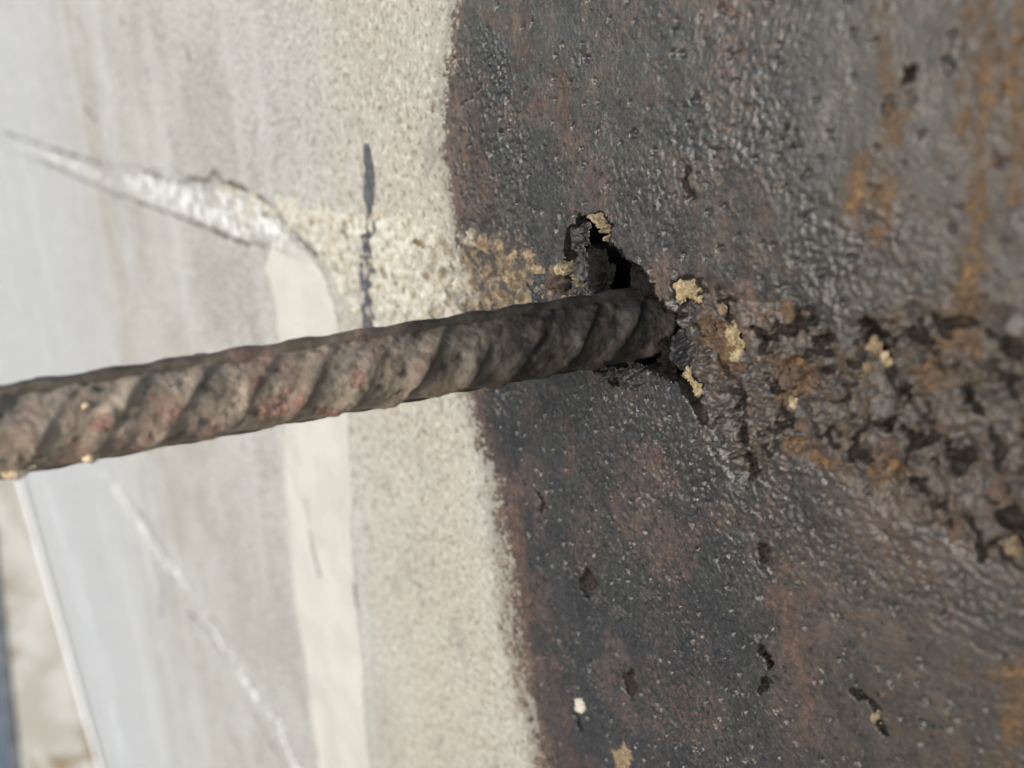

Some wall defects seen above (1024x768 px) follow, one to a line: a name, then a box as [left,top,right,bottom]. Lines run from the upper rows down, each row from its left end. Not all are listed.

corrosion [700,312,744,376]
corrosion [249,377,340,419]
spalling [215,183,1024,572]